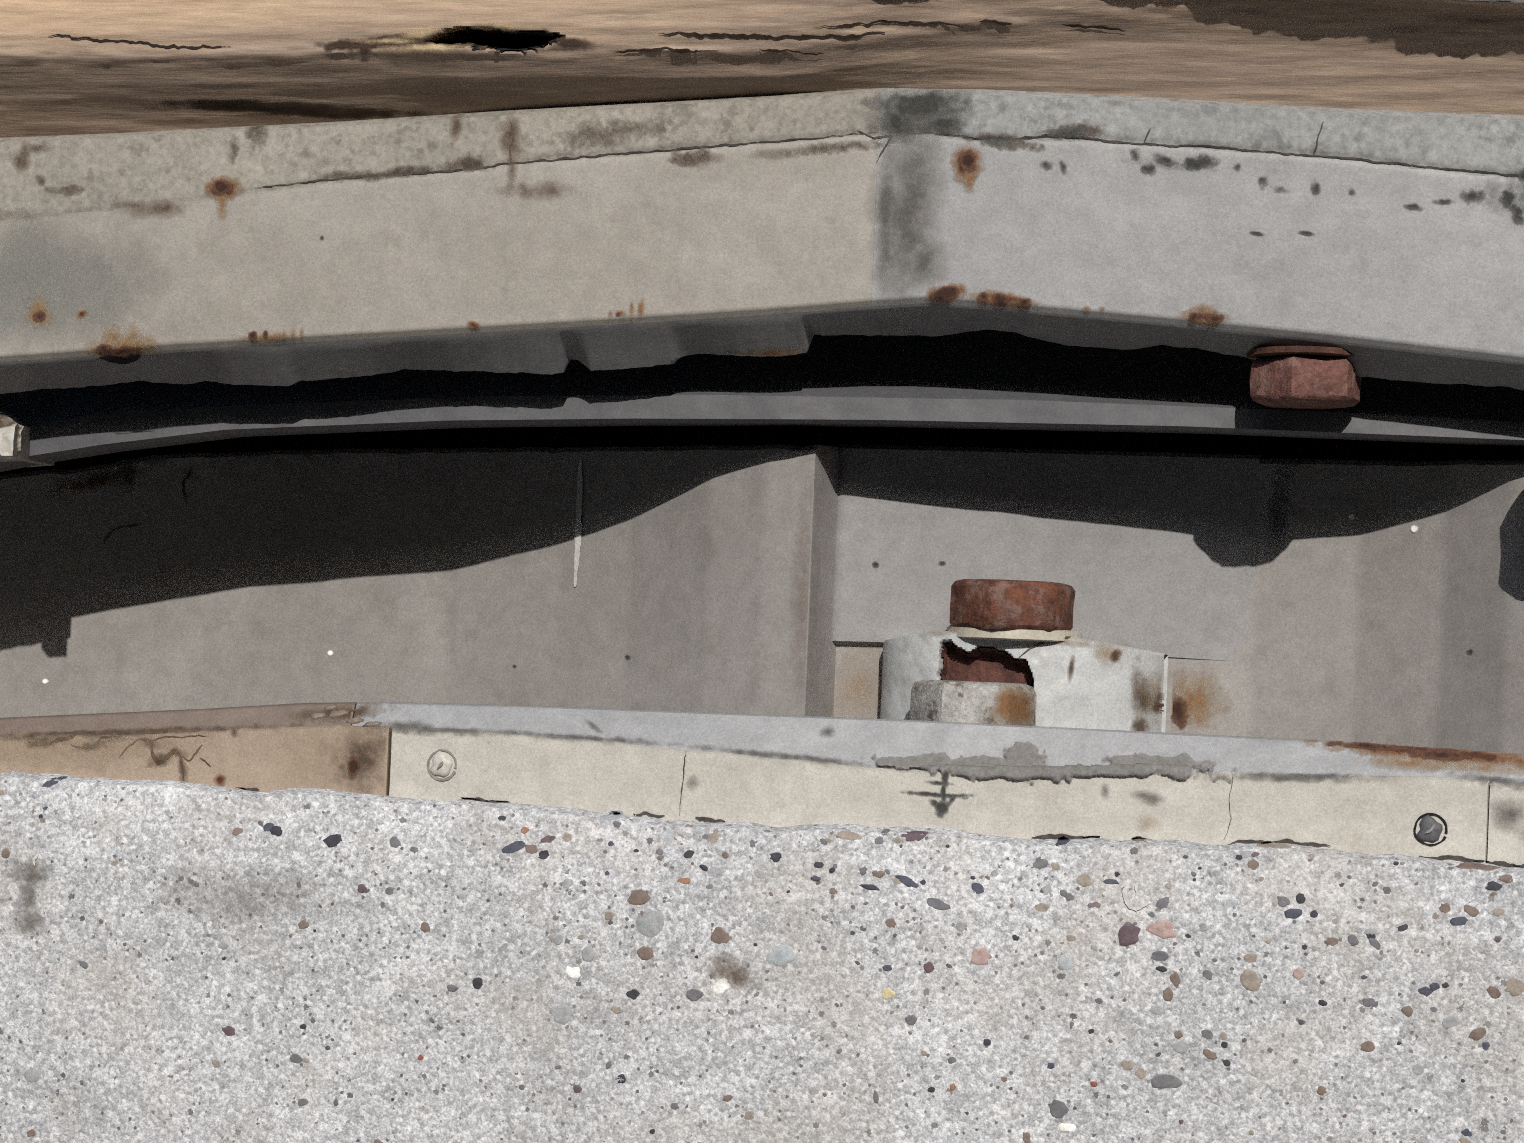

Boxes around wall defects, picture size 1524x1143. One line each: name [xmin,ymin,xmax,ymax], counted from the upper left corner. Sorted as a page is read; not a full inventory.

damp [865,90,968,137]
mould [1051,126,1083,139]
corrosion [953,148,980,189]
mould [1131,149,1218,173]
corrosion [206,177,239,213]
damp [879,152,934,278]
mould [1404,169,1524,223]
corrosion [928,285,1031,307]
spalling [0,410,55,467]
corrosion [1133,675,1211,731]
crack [28,734,259,791]
corrosion [1325,741,1524,771]